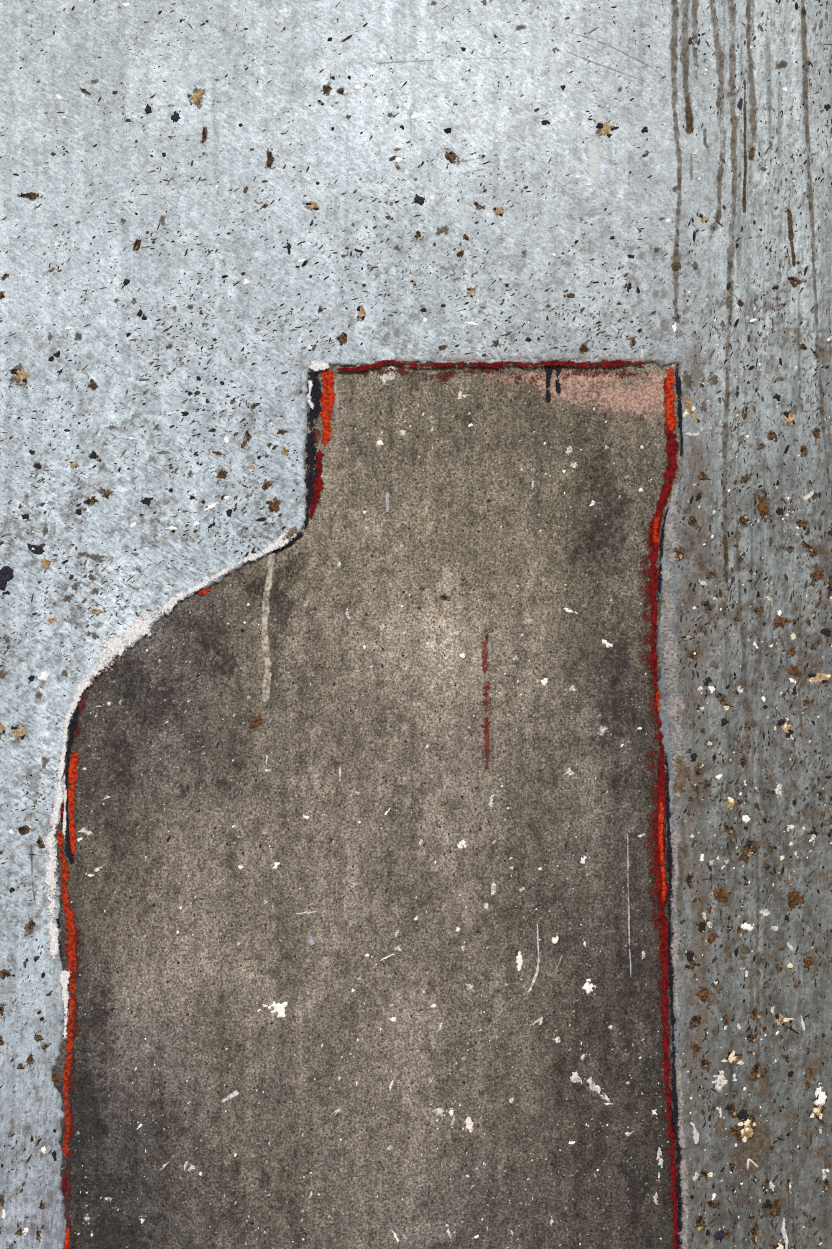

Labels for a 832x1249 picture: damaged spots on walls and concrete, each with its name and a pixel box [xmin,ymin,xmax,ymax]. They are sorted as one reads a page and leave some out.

water stain [786,207,795,266]
water stain [801,0,830,482]
spalling [337,306,366,346]
water stain [670,0,757,784]
spalling [757,393,798,450]
spalling [800,428,821,457]
peeling [0,337,732,1249]
spalling [724,824,773,869]
spalling [728,1008,786,1081]
spalling [726,1103,756,1143]
spalling [809,1091,828,1127]
spalling [750,1178,791,1249]